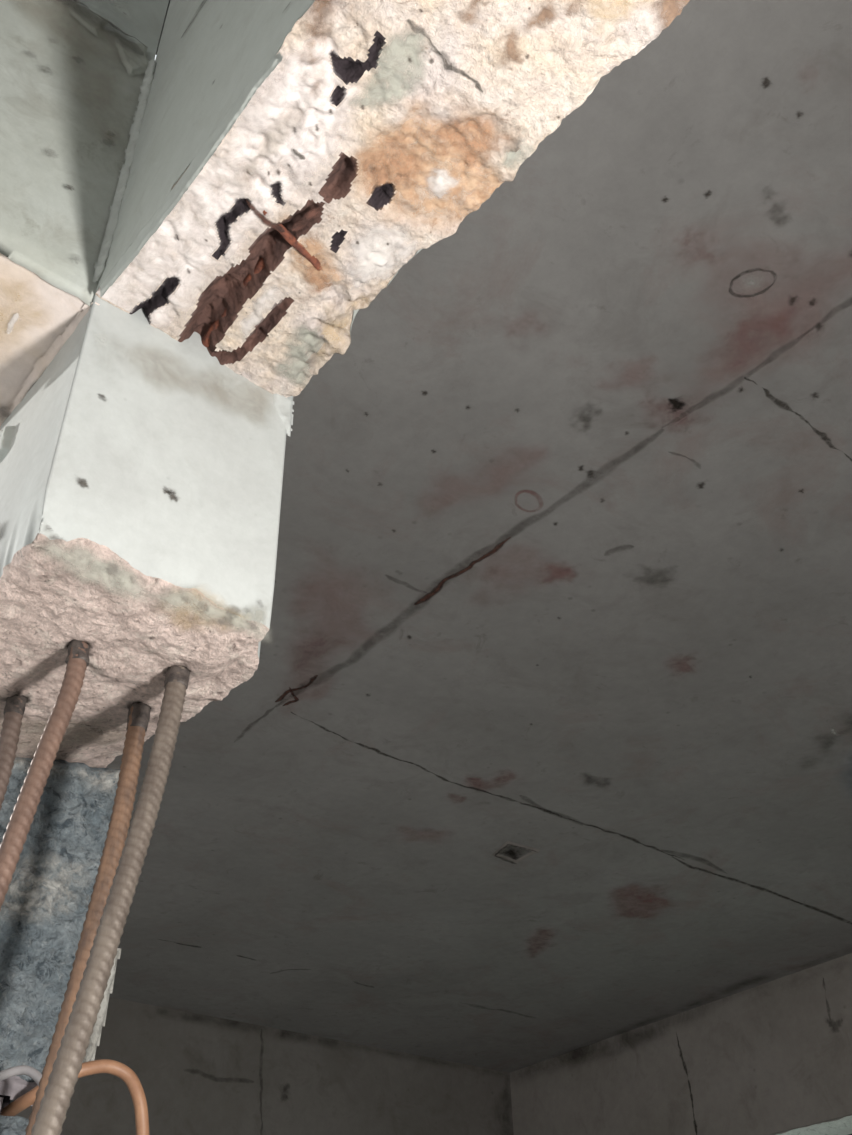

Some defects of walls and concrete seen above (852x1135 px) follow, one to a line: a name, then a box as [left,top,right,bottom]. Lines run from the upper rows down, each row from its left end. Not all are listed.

spalling [6,31,423,418]
crack [246,200,321,232]
rust [295,239,339,289]
spalling [273,328,324,436]
crack [744,377,852,461]
crack [414,537,511,605]
spalling [0,533,269,768]
crack [275,675,852,924]
crack [676,1033,697,1135]